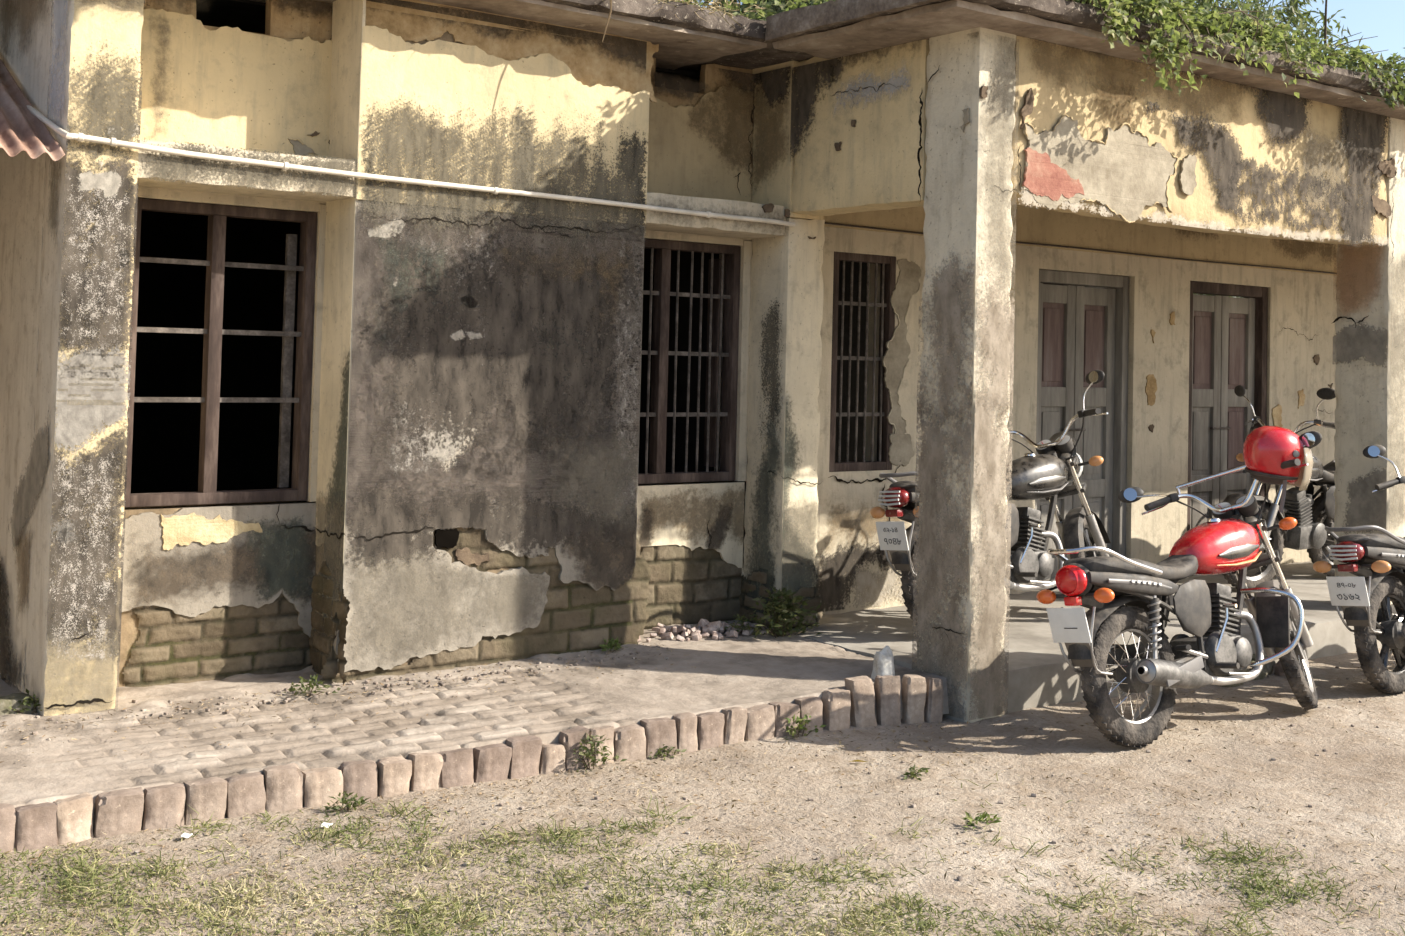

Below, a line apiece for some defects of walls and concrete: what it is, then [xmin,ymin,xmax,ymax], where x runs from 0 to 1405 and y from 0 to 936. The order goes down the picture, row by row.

damp [49,41,162,356]
crack [368,216,642,238]
flaking render [365,0,659,103]
damp [652,73,786,182]
peeling [1020,88,1197,223]
damp [1035,40,1391,261]
crack [276,504,435,541]
damp [0,96,744,714]
flaking render [47,161,823,687]
damp [758,297,819,629]
peeling [882,259,921,466]